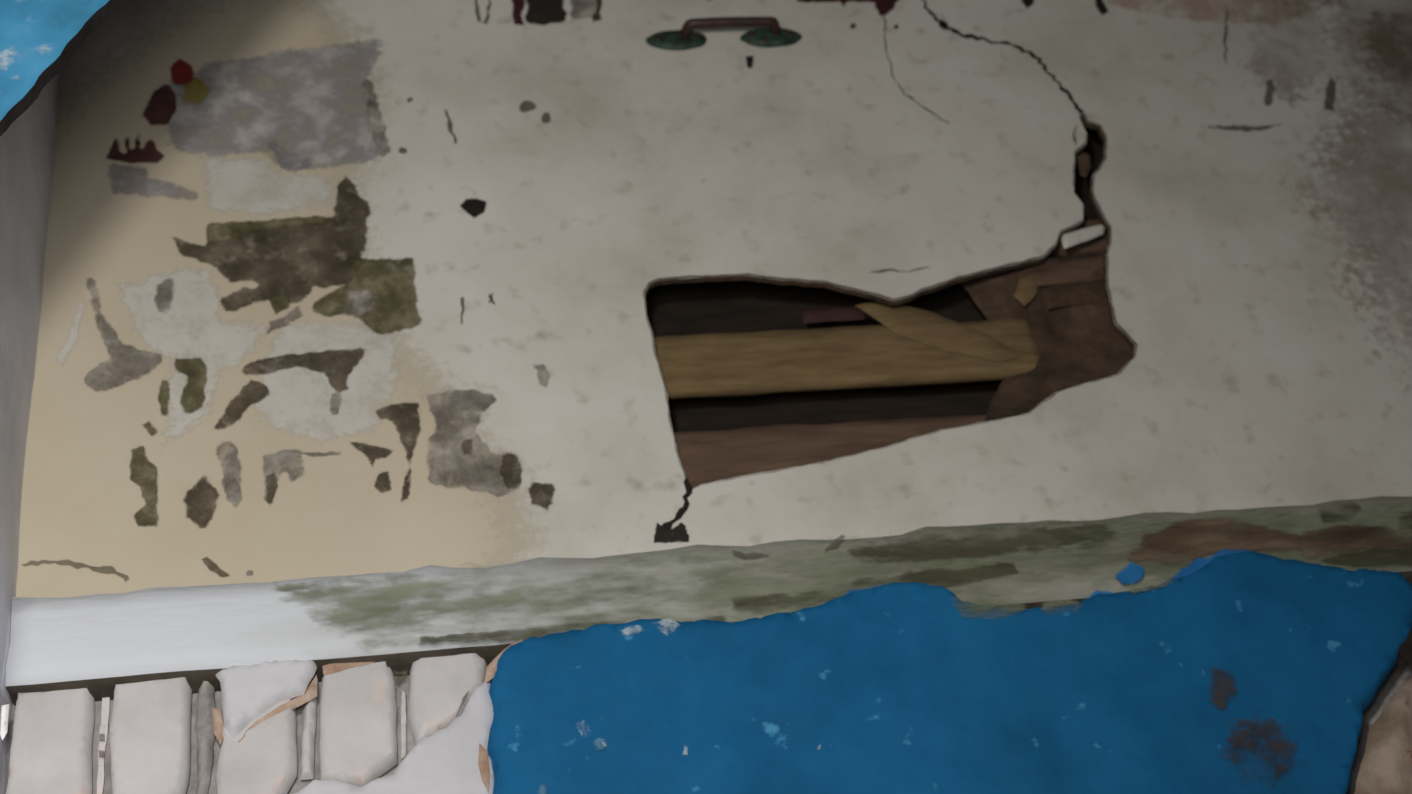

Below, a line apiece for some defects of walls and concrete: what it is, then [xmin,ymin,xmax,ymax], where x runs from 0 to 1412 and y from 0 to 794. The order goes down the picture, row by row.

crack [883,16,949,123]
crack [923,0,1083,145]
leakage [1265,80,1274,105]
leakage [1325,79,1336,110]
peeling [107,40,421,334]
hole [643,110,1138,477]
peeling [84,278,207,526]
peeling [184,348,364,528]
peeling [263,390,555,509]
crack [654,479,693,543]
mould [689,501,1412,622]
flaking render [0,653,487,794]